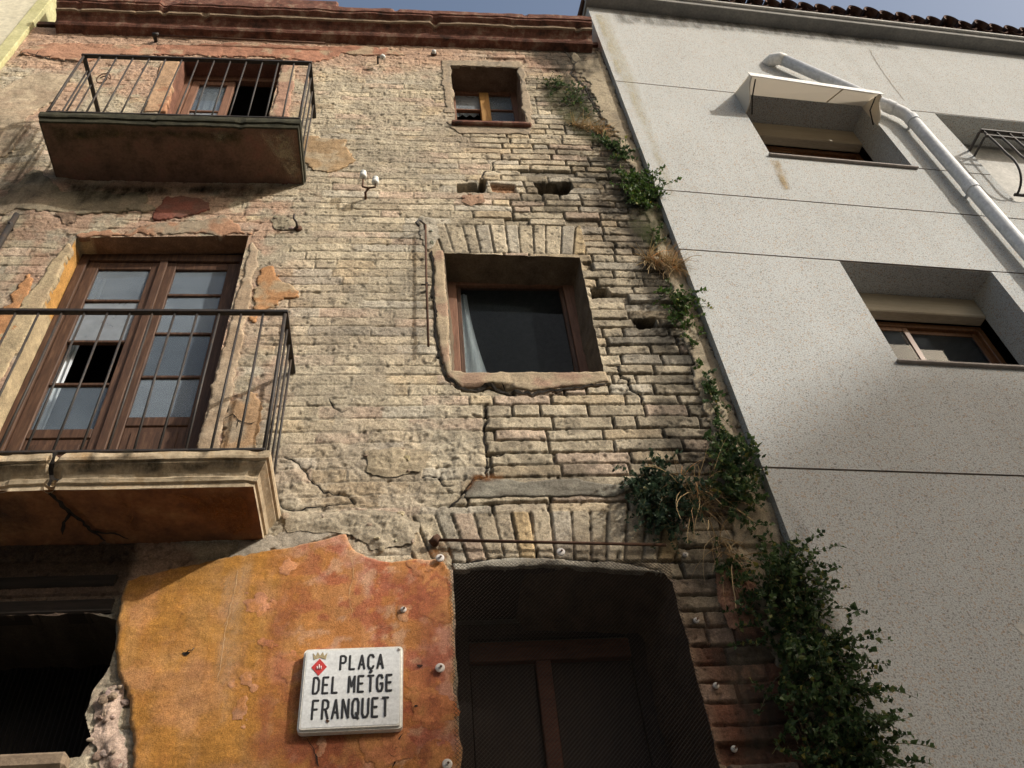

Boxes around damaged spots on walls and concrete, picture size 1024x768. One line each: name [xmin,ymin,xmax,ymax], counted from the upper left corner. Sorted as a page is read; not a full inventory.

peeling [304,135,356,173]
peeling [0,169,299,448]
crack [47,452,128,541]
crack [280,458,354,511]
peeling [86,509,463,768]